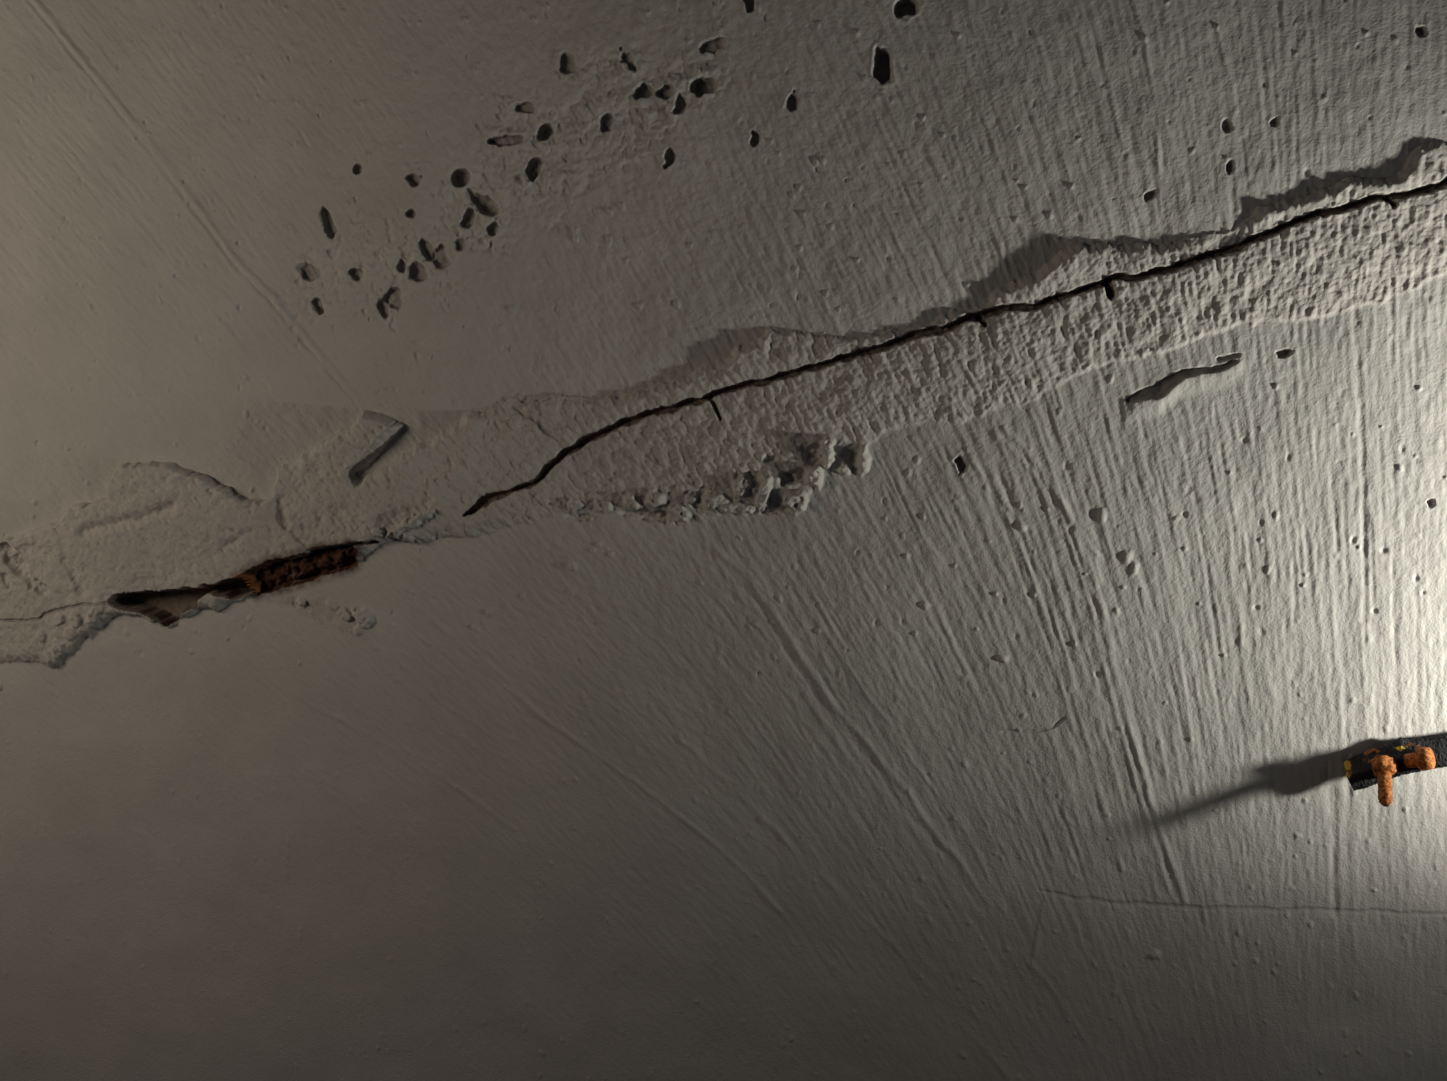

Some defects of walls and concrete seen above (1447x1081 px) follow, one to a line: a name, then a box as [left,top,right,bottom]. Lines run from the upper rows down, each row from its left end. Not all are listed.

spalling [279,0,755,345]
crack [463,177,1447,517]
rust [227,535,371,604]
spalling [287,589,376,640]